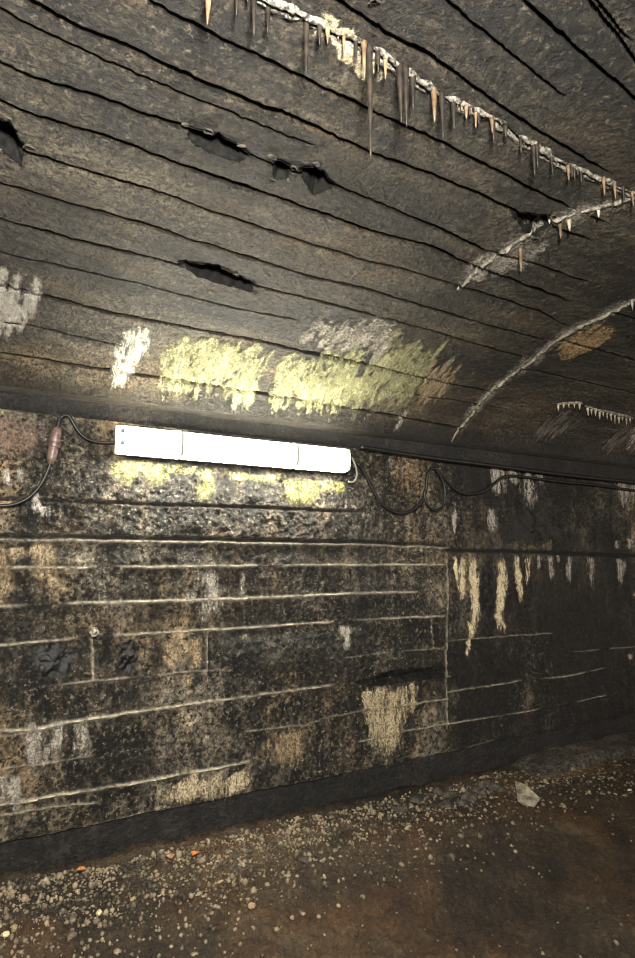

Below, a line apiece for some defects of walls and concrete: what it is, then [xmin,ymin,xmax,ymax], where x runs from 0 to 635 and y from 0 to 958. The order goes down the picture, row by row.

spalling [0,116,35,165]
spalling [181,122,250,162]
spalling [266,154,335,195]
damp [235,0,635,291]
spalling [178,259,257,296]
damp [111,325,150,388]
damp [158,328,462,429]
damp [451,298,635,442]
damp [535,401,635,453]
damp [487,468,565,545]
damp [453,556,572,656]
damp [361,683,418,761]